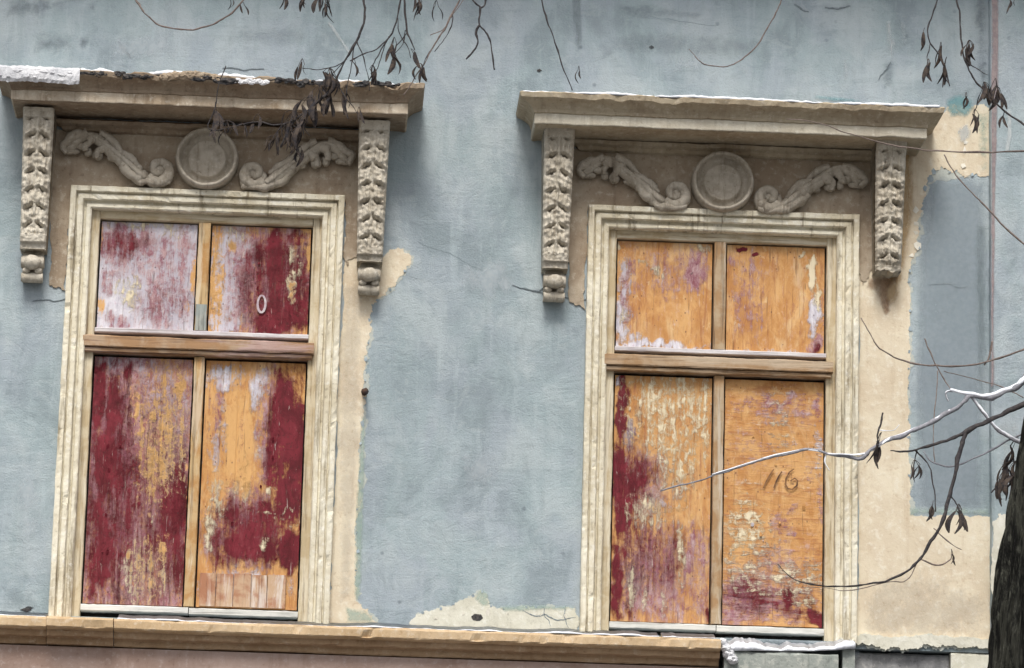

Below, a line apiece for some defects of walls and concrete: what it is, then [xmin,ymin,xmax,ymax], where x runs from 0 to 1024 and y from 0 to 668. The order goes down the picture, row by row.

peeling [329,248,414,623]
peeling [409,589,579,634]
crack [523,605,576,625]
peeling [720,0,1006,668]